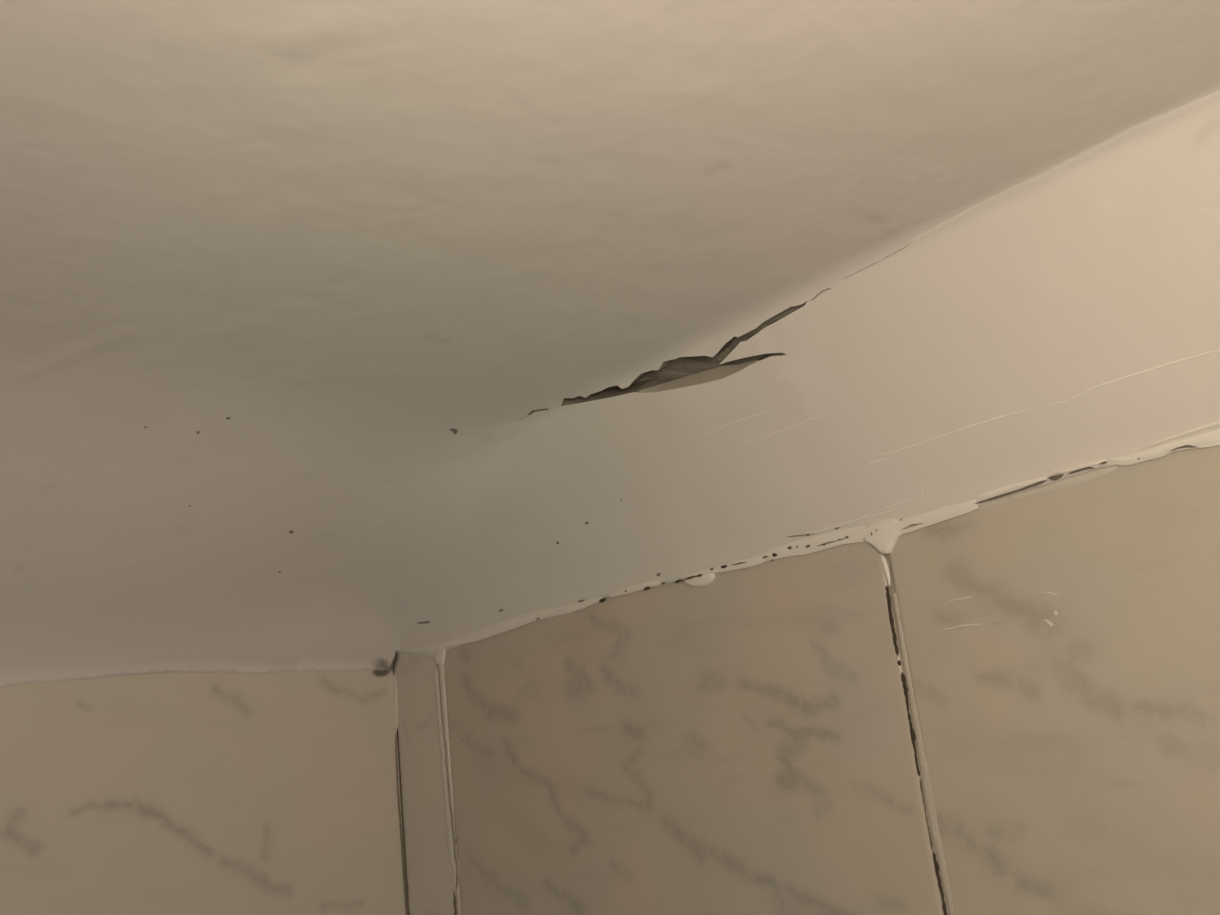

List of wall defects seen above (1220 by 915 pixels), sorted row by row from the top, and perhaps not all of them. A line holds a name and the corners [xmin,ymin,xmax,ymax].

crack [528,288,831,416]
water stain [763,534,848,561]
water stain [644,562,746,590]